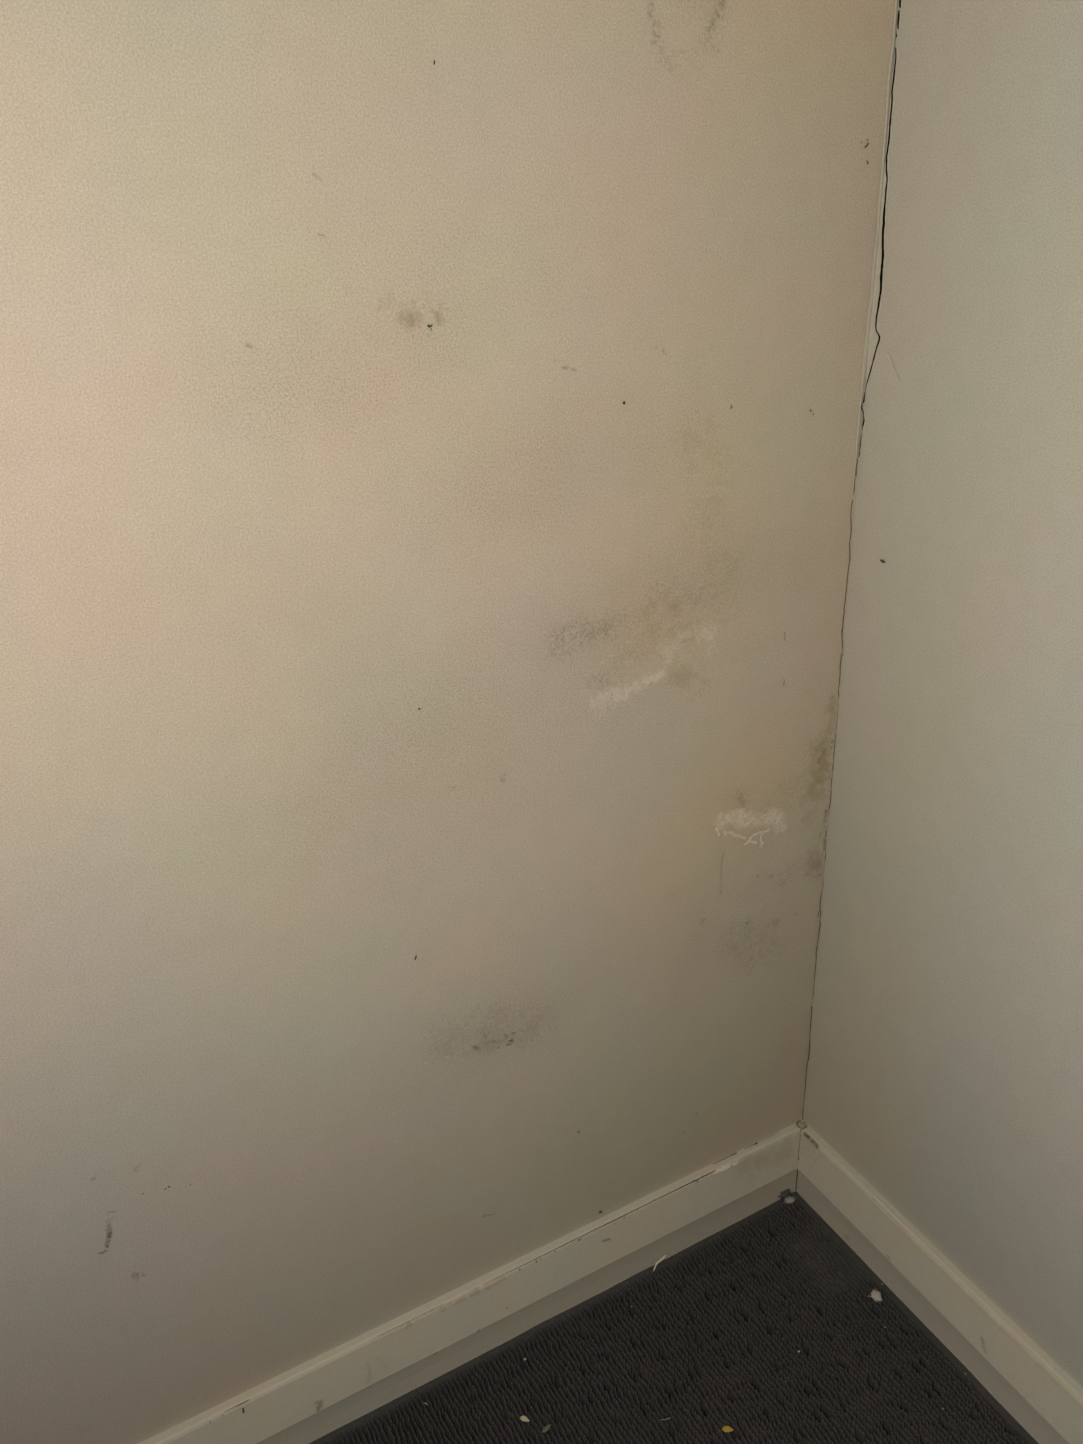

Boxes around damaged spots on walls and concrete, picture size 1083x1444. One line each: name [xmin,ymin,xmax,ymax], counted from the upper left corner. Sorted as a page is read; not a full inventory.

damp [541,409,745,704]
crack [485,0,903,1284]